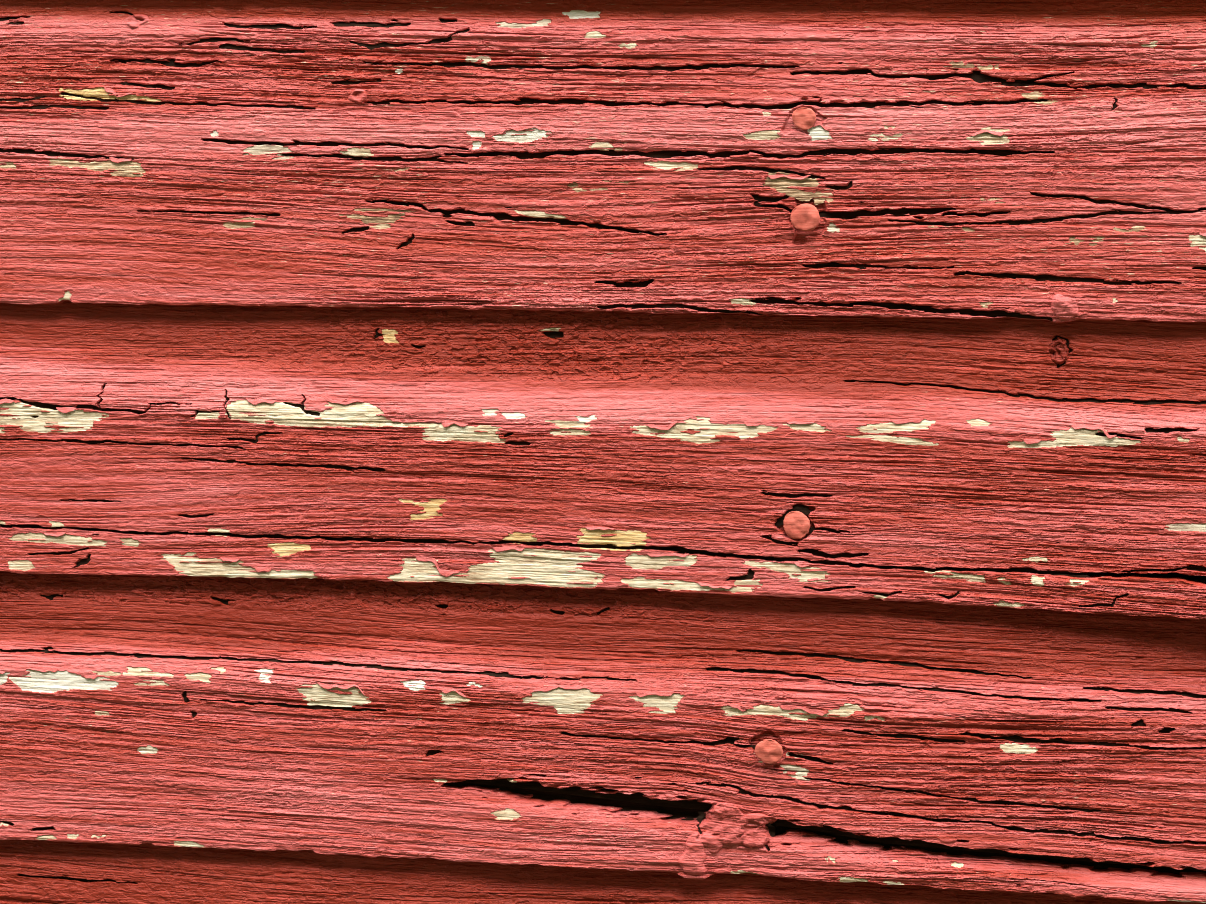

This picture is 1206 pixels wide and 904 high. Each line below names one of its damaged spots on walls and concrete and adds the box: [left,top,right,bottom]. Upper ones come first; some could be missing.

peeling [0,399,109,433]
peeling [195,398,527,443]
peeling [630,416,831,444]
peeling [846,418,939,446]
peeling [1007,424,1141,448]
peeling [161,542,317,579]
peeling [387,526,830,593]
peeling [0,666,226,693]
crack [706,649,1206,713]
crack [562,731,756,749]
crack [842,729,1206,750]
crack [444,752,1206,875]